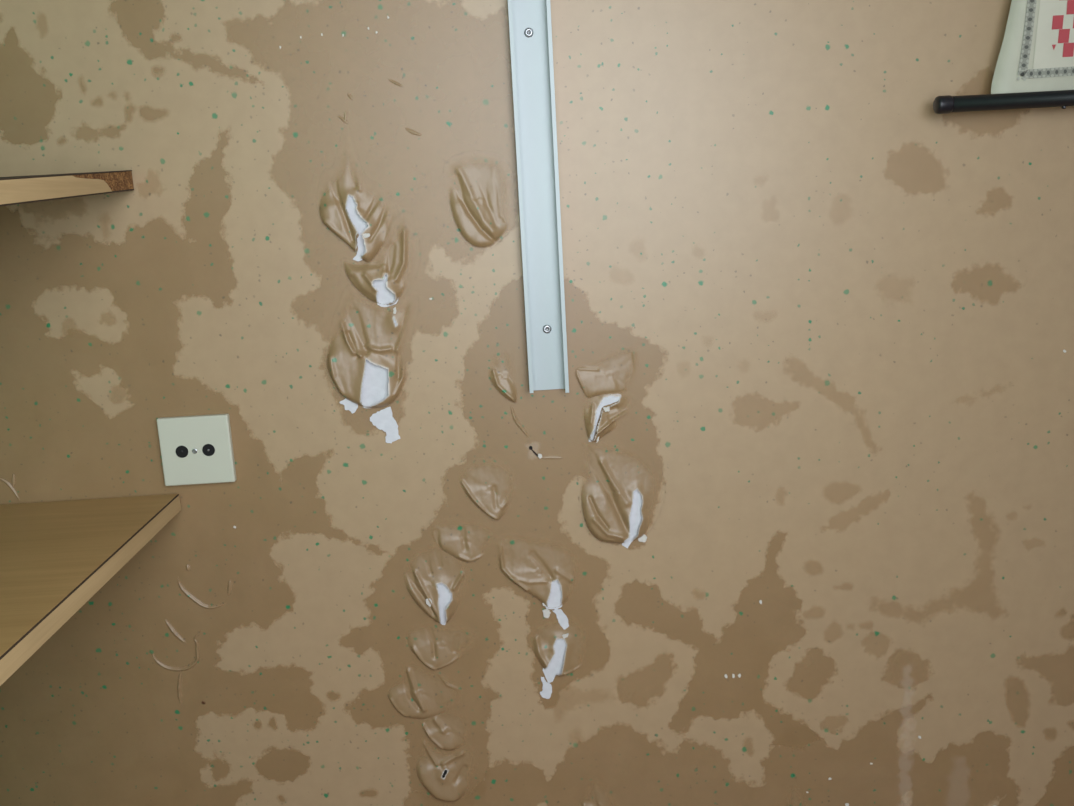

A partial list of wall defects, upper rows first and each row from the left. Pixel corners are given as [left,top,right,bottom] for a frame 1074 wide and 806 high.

damp [0,27,166,145]
damp [111,0,258,83]
damp [272,0,513,324]
damp [0,131,1018,806]
damp [1036,746,1074,806]